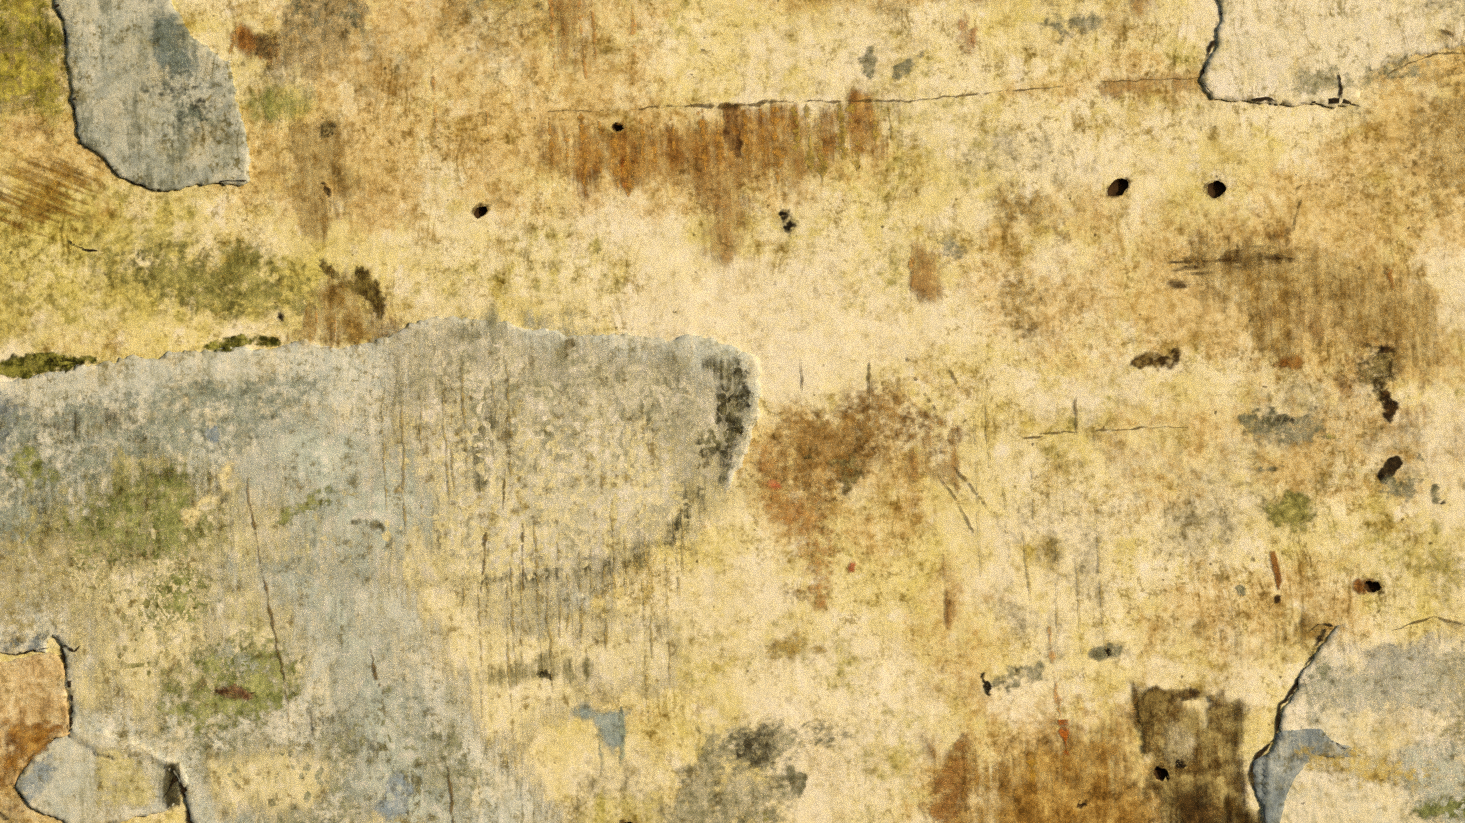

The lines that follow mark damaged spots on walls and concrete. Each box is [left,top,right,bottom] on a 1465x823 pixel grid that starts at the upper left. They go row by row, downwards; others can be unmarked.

peeling [54,0,251,192]
rust [541,90,893,263]
water stain [959,20,977,50]
water stain [1131,0,1149,16]
flaking render [1200,0,1465,108]
peeling [0,311,761,823]
rust [757,387,962,608]
flaking render [1133,625,1465,823]